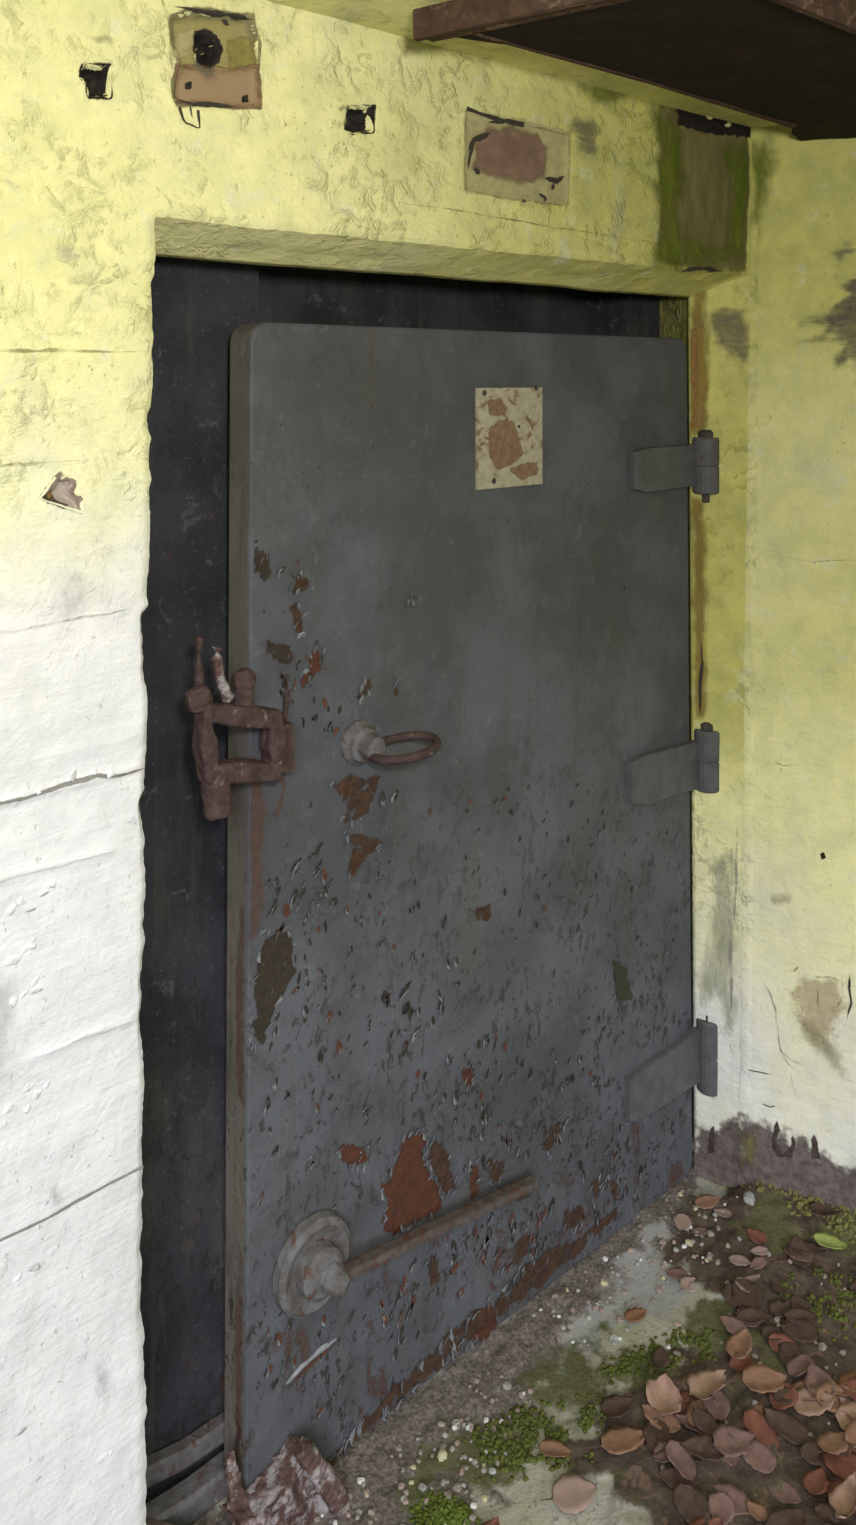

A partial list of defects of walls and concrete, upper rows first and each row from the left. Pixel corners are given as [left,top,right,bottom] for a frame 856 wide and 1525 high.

spalling [464,106,570,205]
water stain [655,116,749,267]
water stain [815,279,856,363]
spalling [39,472,83,515]
crack [0,767,144,808]
peeling [248,842,477,1160]
crack [0,1166,144,1242]
rust [336,1142,368,1176]
rust [380,1124,508,1238]
peeling [416,1033,678,1230]
water stain [690,1113,856,1211]
rust [327,1174,627,1465]